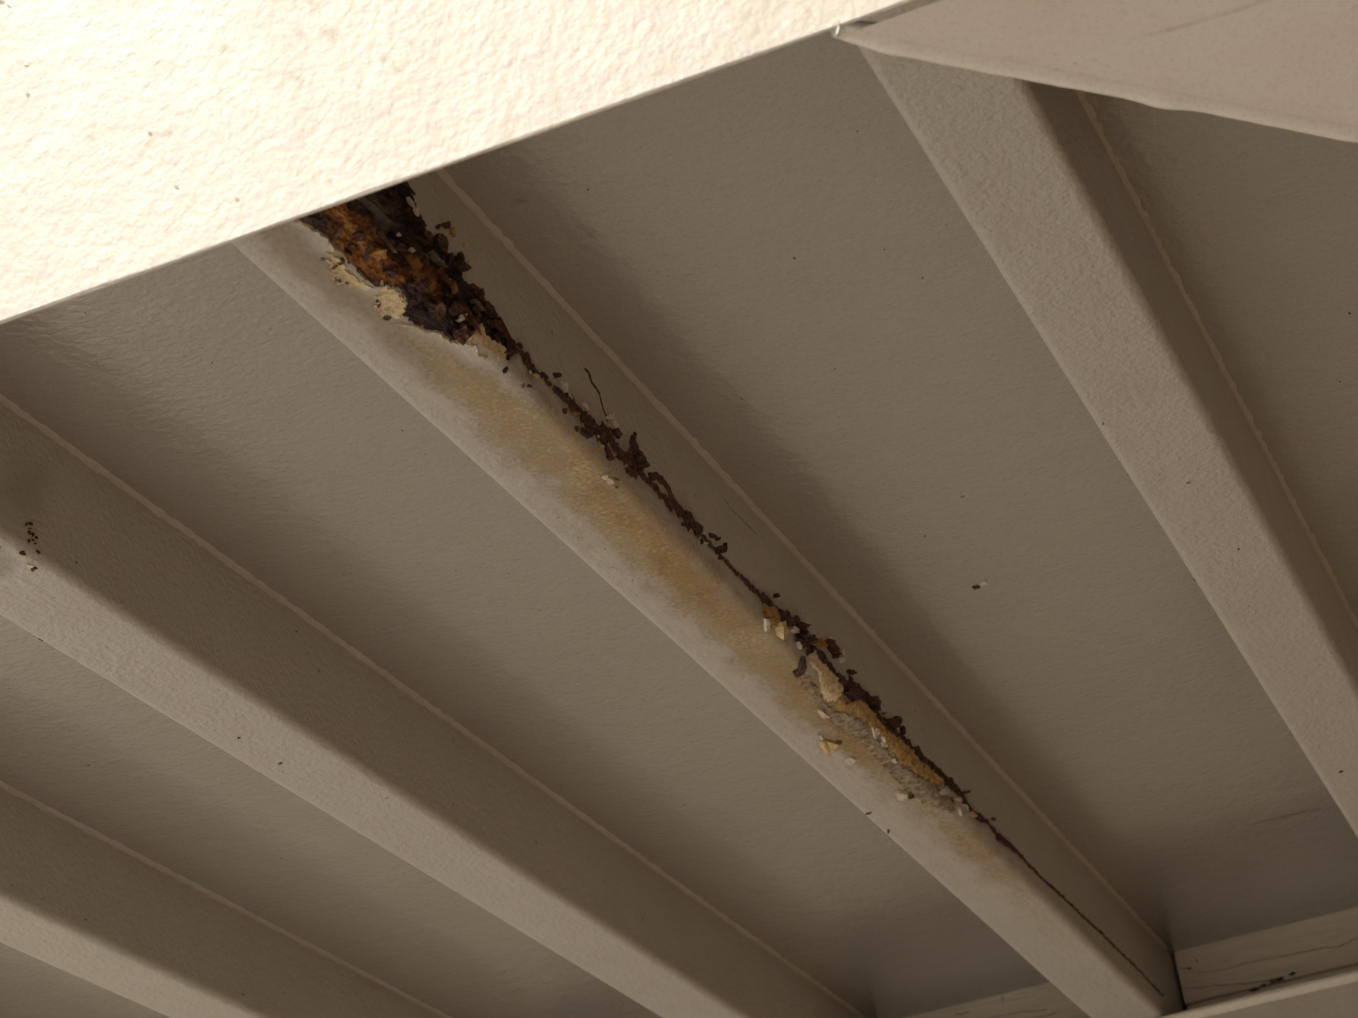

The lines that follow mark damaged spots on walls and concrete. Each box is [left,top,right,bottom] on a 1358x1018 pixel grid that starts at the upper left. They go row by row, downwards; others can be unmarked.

peeling [762,593,996,823]